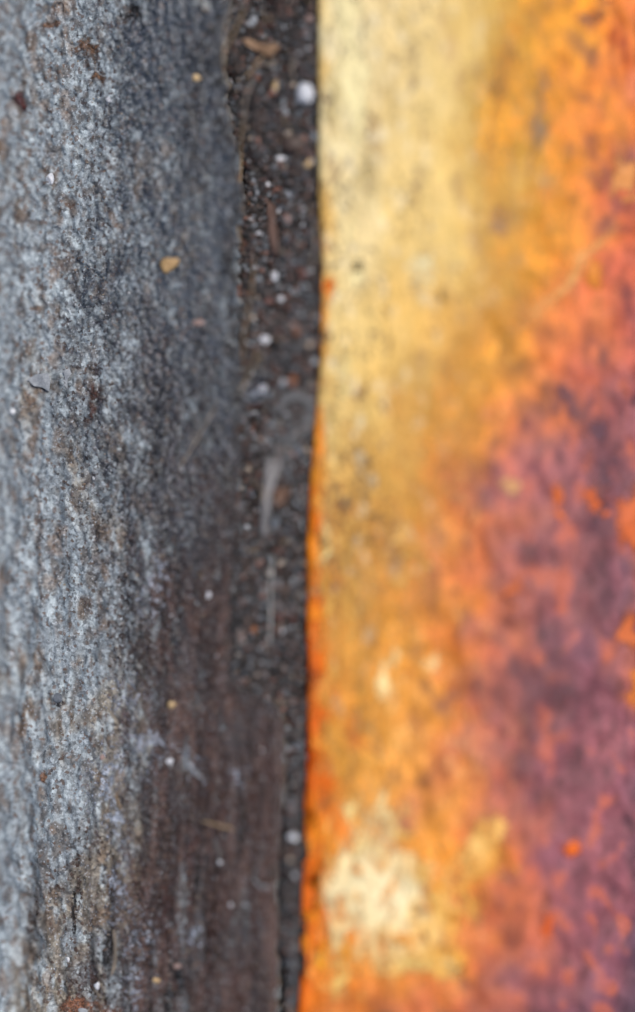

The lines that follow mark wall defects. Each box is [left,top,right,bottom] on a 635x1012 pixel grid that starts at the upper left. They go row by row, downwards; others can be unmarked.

corrosion [611,155,635,202]
corrosion [559,384,609,442]
leakage [51,0,243,1011]
corrosion [306,401,321,587]
corrosion [584,469,635,549]
corrosion [616,612,635,649]
corrosion [298,598,335,1012]
corrosion [564,841,581,857]